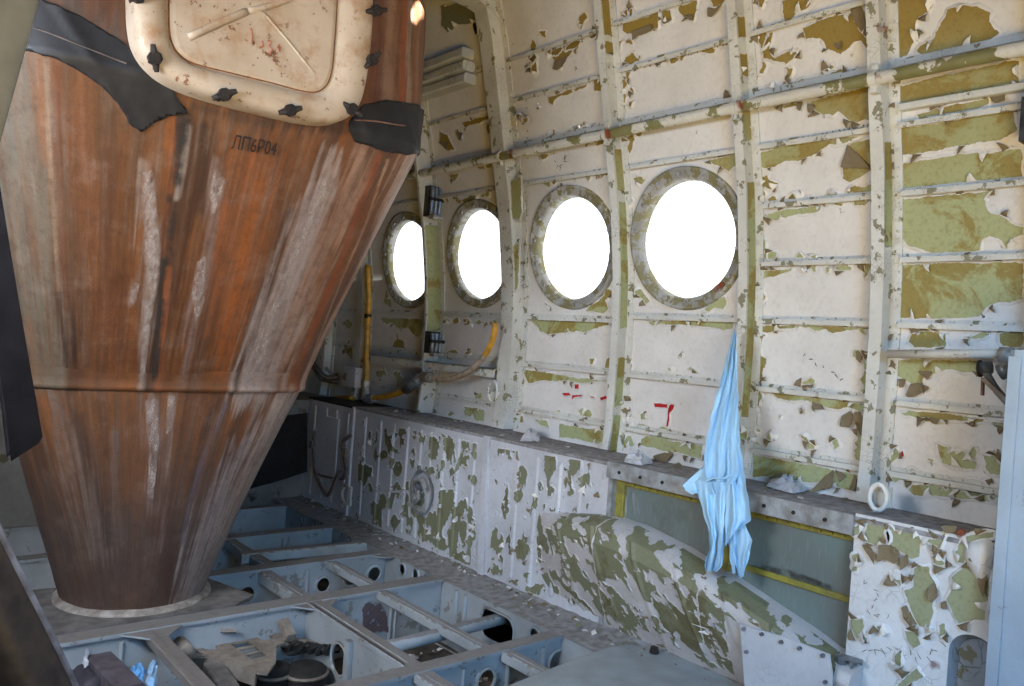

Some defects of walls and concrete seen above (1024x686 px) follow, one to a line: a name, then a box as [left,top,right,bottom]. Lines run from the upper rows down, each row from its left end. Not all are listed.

peeling [897,0,1004,60]
peeling [508,239,521,293]
peeling [507,175,523,222]
peeling [514,0,871,499]
peeling [885,57,1024,507]
peeling [305,355,842,686]
peeling [847,506,996,686]